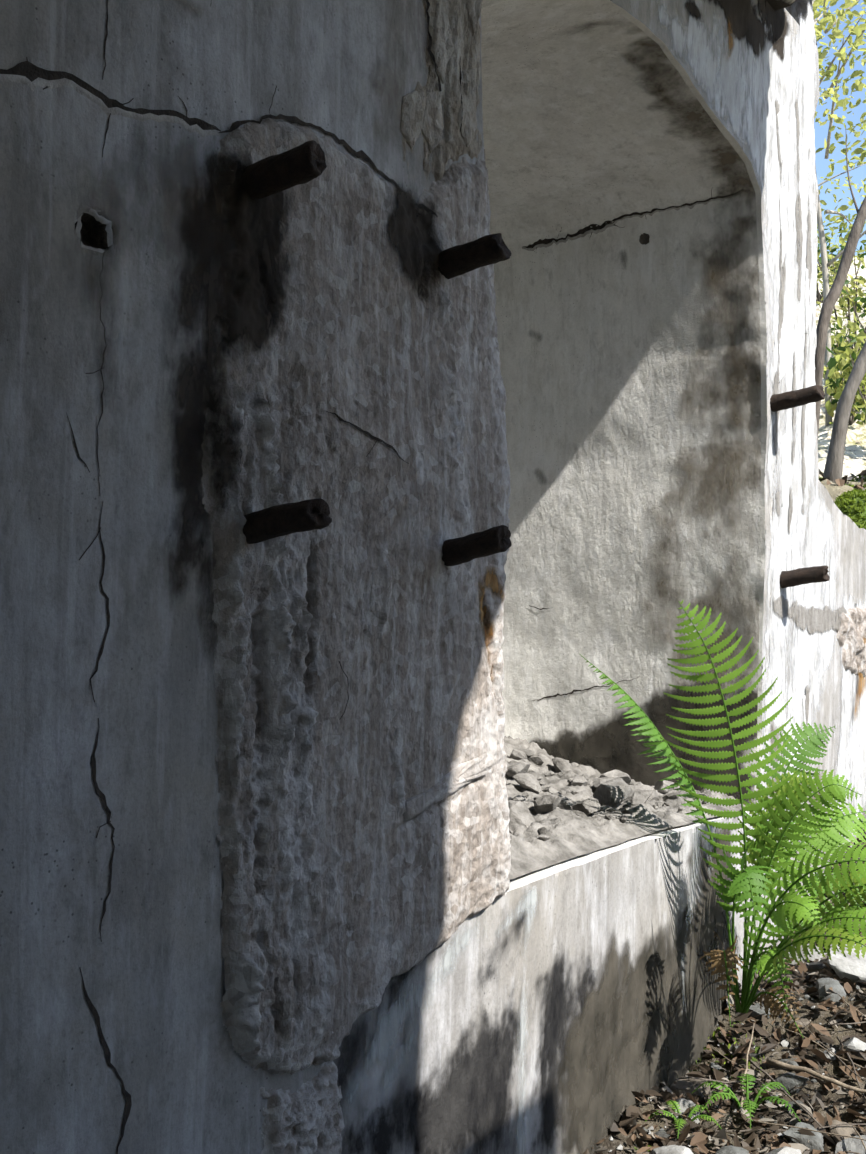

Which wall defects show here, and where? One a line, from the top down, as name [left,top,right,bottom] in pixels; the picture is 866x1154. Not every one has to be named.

crack [0,0,438,218]
peeling [400,0,491,251]
crack [522,187,751,251]
damp [625,39,754,194]
damp [707,218,761,427]
peeling [774,101,812,394]
crack [66,253,115,942]
spalling [200,118,511,1154]
corrosion [479,568,504,659]
spalling [774,595,866,677]
crack [79,967,132,1154]
damp [337,829,733,1154]